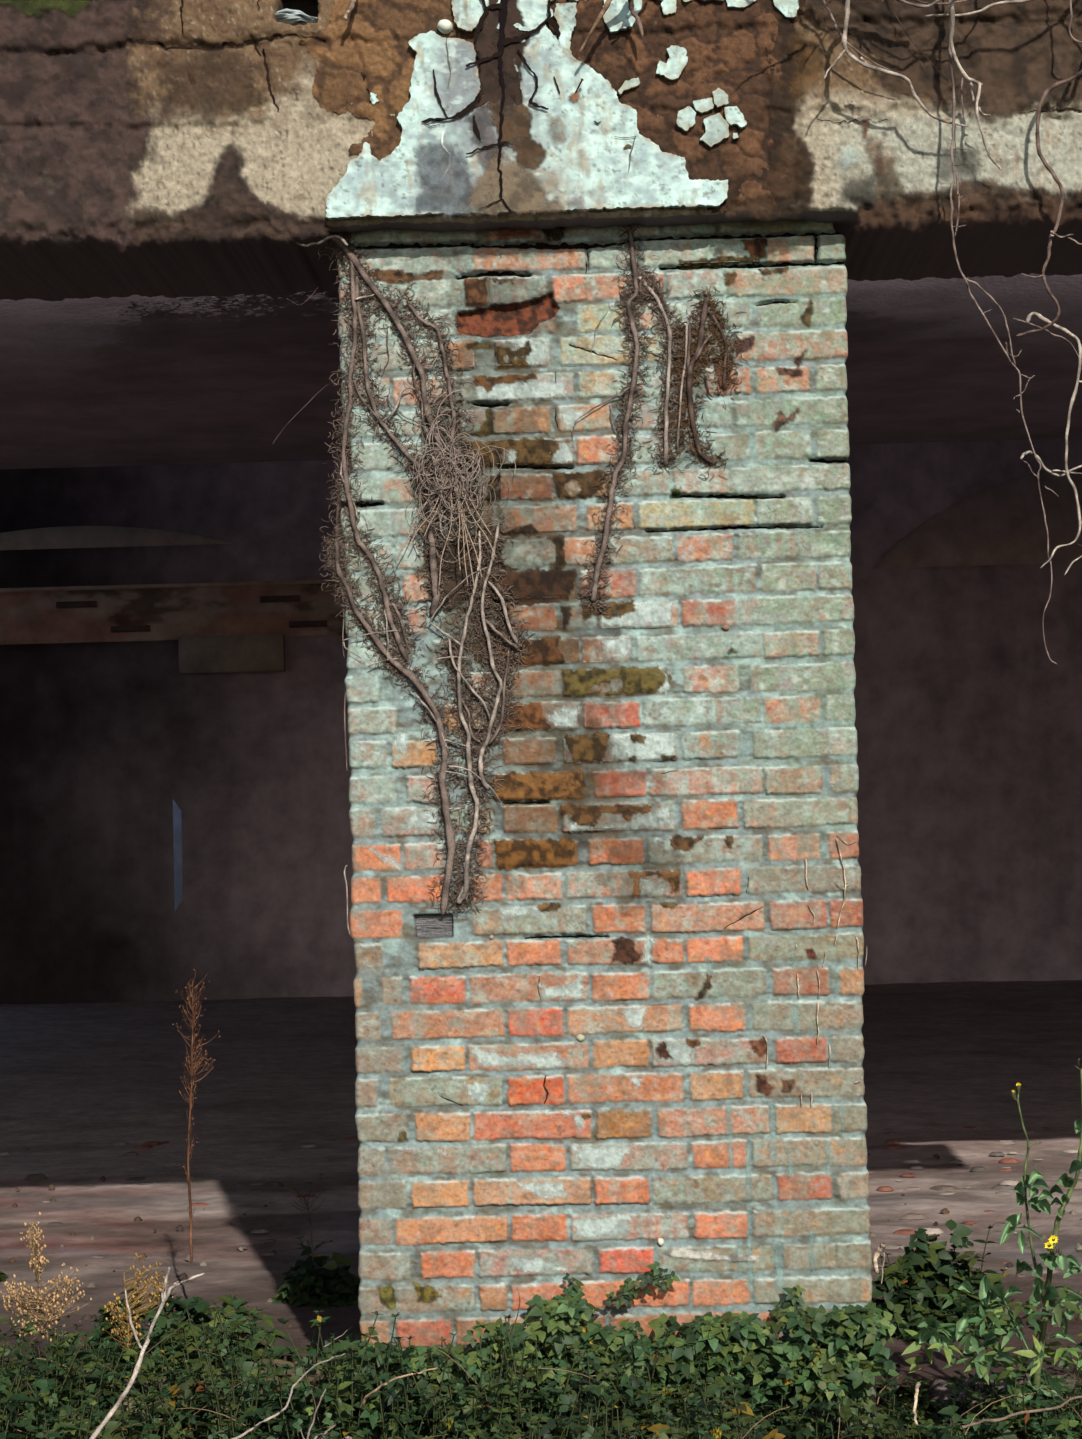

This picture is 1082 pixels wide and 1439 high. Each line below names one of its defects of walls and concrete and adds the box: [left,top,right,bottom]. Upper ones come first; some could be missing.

crack [129,0,326,112]
crack [421,0,560,212]
flaking render [299,0,806,220]
leakage [367,268,443,283]
leakage [679,238,788,285]
spalling [456,295,558,337]
leakage [428,338,606,503]
leakage [427,524,704,871]
leakage [629,869,681,908]
leakage [472,1047,567,1069]
leakage [572,1145,629,1168]
leakage [573,1214,631,1238]